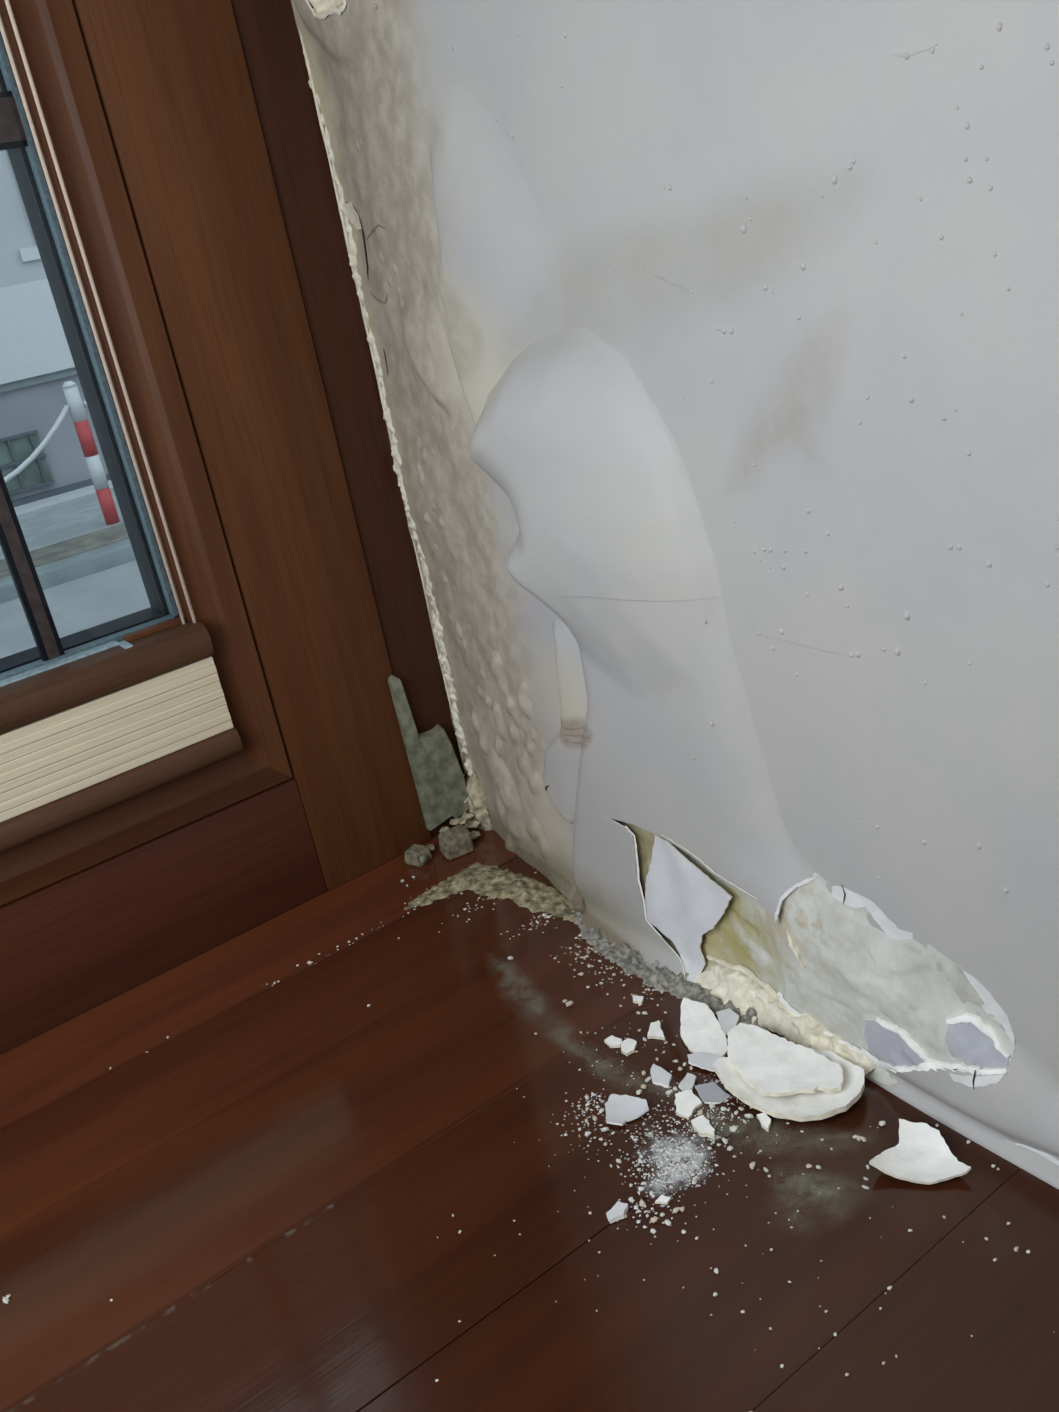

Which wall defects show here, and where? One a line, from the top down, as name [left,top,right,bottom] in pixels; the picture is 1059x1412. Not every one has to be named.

flaking render [305,0,347,20]
flaking render [298,27,550,861]
peeling [650,1052,730,1104]
flaking render [404,822,1016,1087]